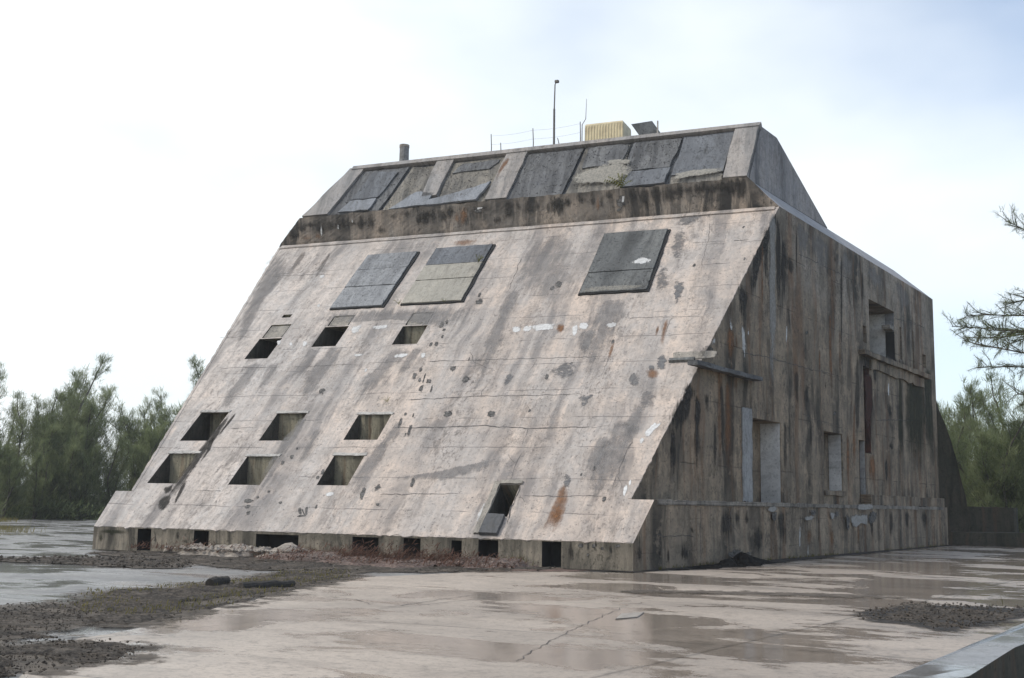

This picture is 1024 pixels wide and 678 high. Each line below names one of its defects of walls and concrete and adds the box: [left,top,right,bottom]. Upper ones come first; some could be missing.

water stain [289,216,383,237]
water stain [391,207,453,223]
water stain [494,192,612,222]
water stain [672,216,700,257]
water stain [730,215,797,370]
peeling [512,324,554,332]
spalling [412,320,448,392]
water stain [669,384,724,473]
corrosion [549,487,566,521]
peeling [831,504,877,530]